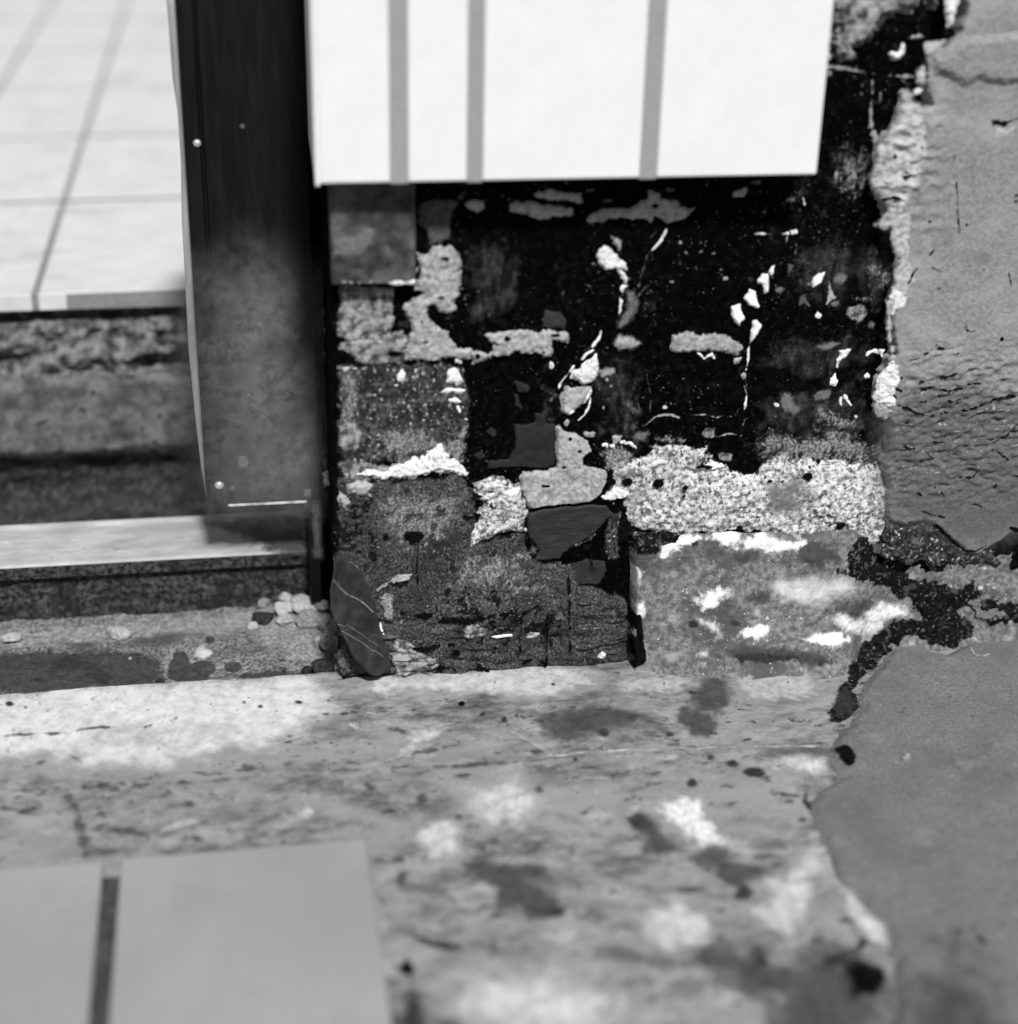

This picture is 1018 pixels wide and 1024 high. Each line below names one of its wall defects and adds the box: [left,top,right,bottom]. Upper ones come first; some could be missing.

flaking render [418,198,484,245]
flaking render [510,188,695,224]
spalling [336,266,423,341]
peeling [593,238,638,327]
peeling [731,265,783,326]
peeling [799,272,839,318]
water stain [846,298,874,327]
water stain [869,264,892,286]
spalling [475,331,612,469]
peeling [815,342,852,418]
water stain [584,431,636,470]
spalling [332,445,1001,677]